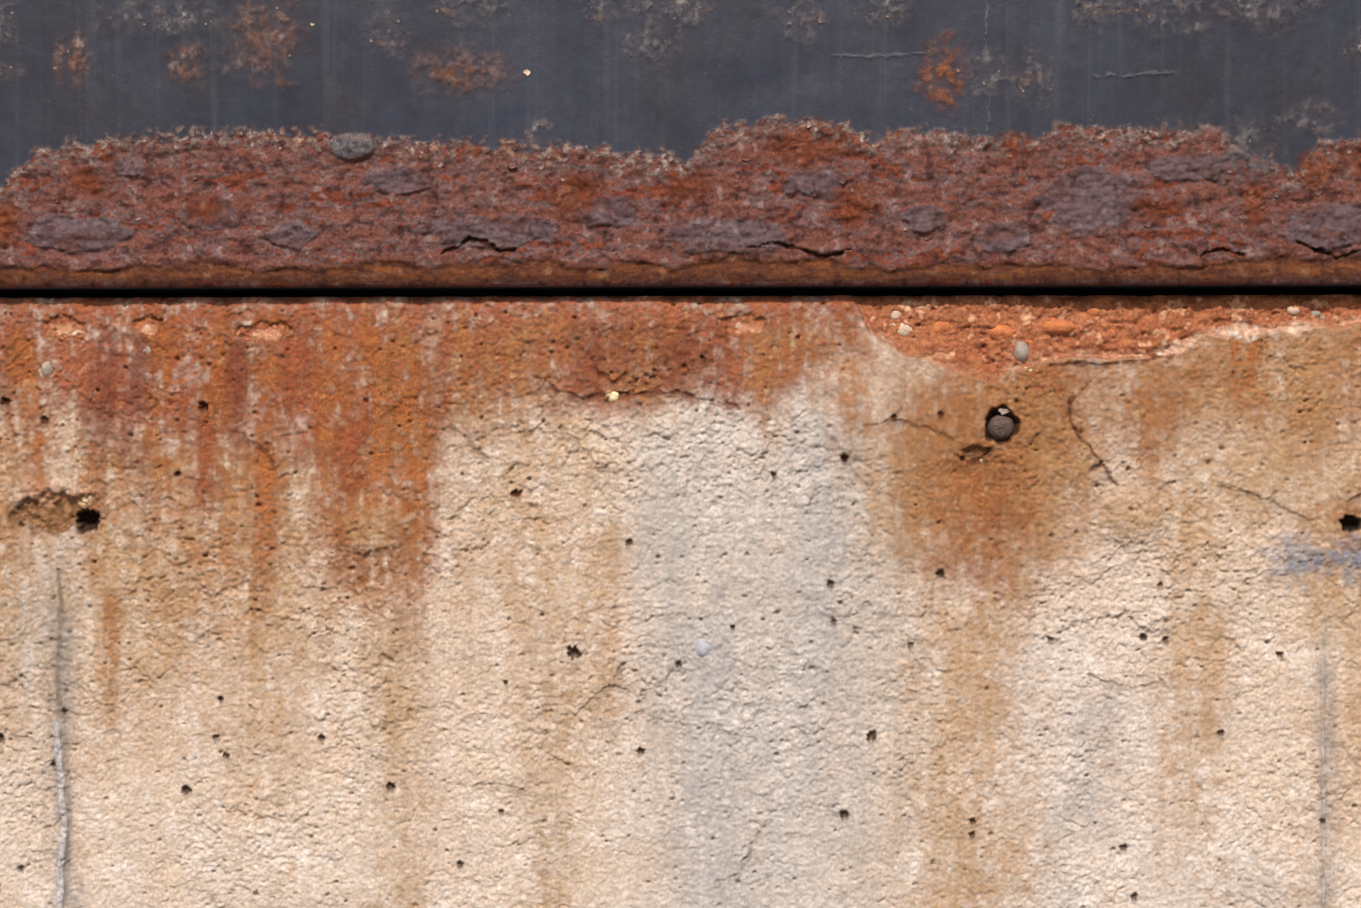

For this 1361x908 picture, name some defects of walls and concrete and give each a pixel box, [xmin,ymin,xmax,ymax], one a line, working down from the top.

corrosion [53,36,87,70]
corrosion [236,4,295,68]
corrosion [419,53,500,88]
corrosion [926,51,960,103]
corrosion [0,295,868,586]
corrosion [895,359,1077,562]
crack [1050,355,1174,485]
corrosion [1117,322,1361,461]